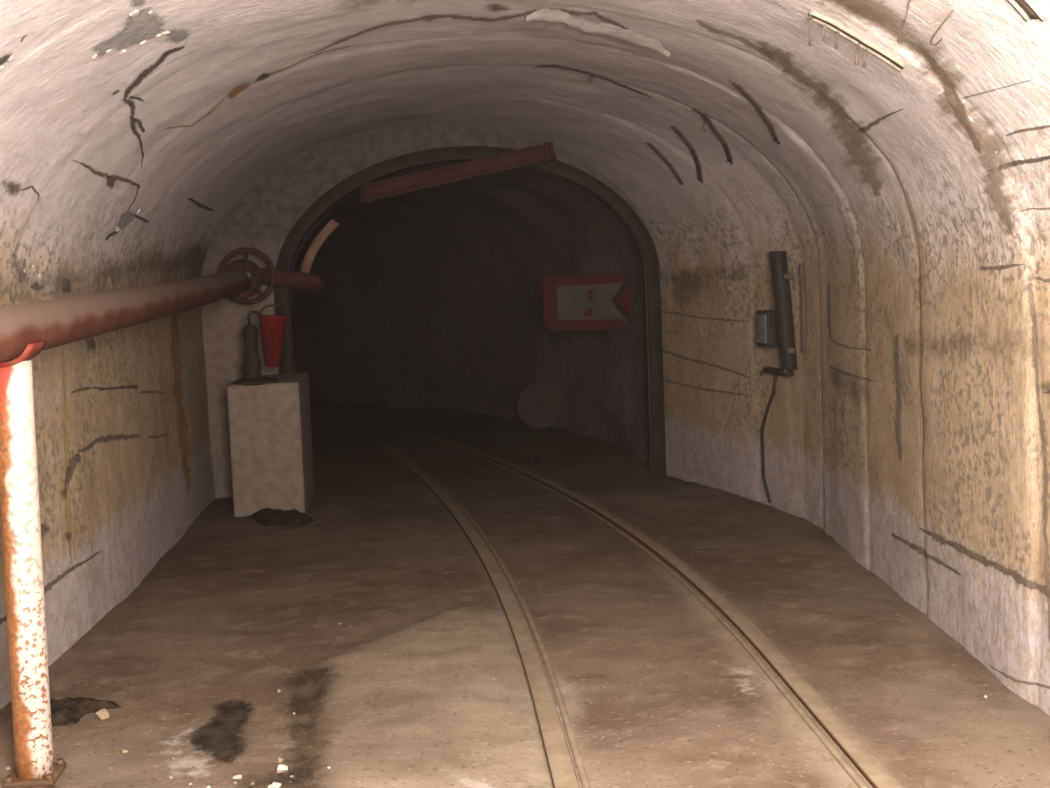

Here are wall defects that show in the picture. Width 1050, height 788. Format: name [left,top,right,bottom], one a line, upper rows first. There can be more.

spalling [92,0,189,59]
crack [73,46,185,212]
rust [171,314,190,493]